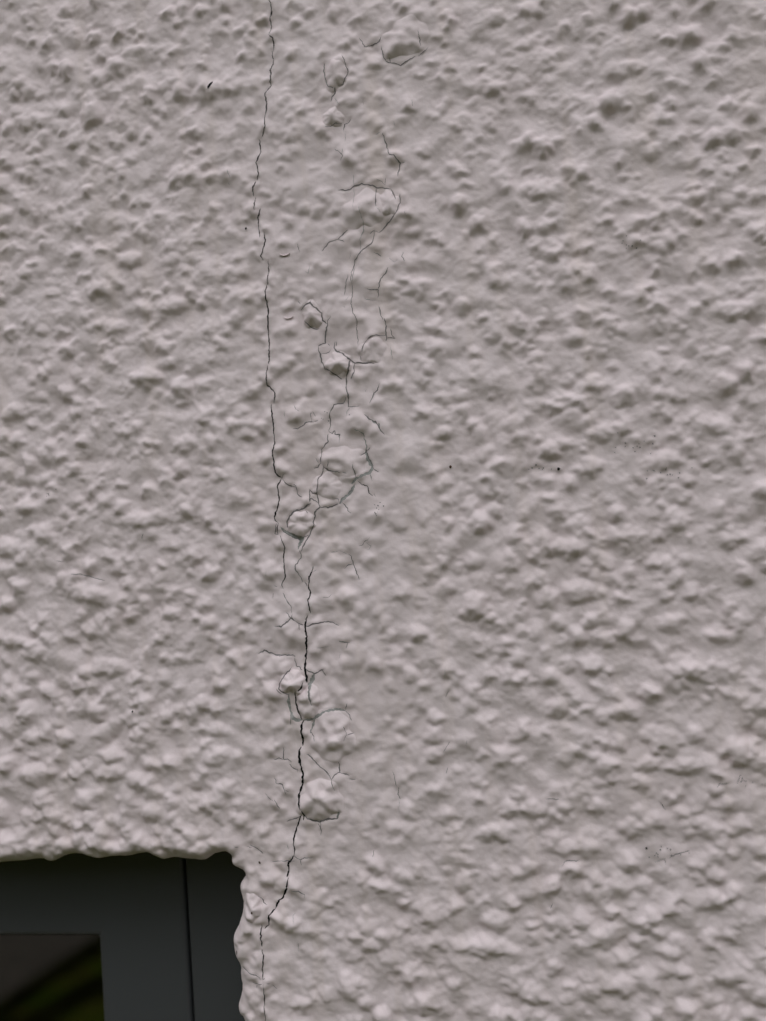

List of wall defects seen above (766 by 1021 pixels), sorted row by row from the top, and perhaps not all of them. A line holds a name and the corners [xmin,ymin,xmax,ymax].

crack [227,0,427,1021]